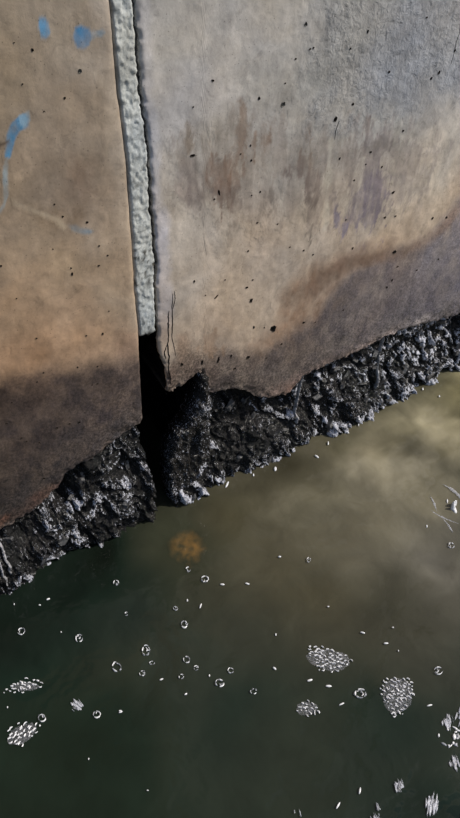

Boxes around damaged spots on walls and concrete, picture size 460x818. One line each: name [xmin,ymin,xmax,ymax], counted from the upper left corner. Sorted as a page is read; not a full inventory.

damp [0,327,142,513]
crack [164,298,176,384]
spalling [0,312,460,595]
damp [150,90,460,397]